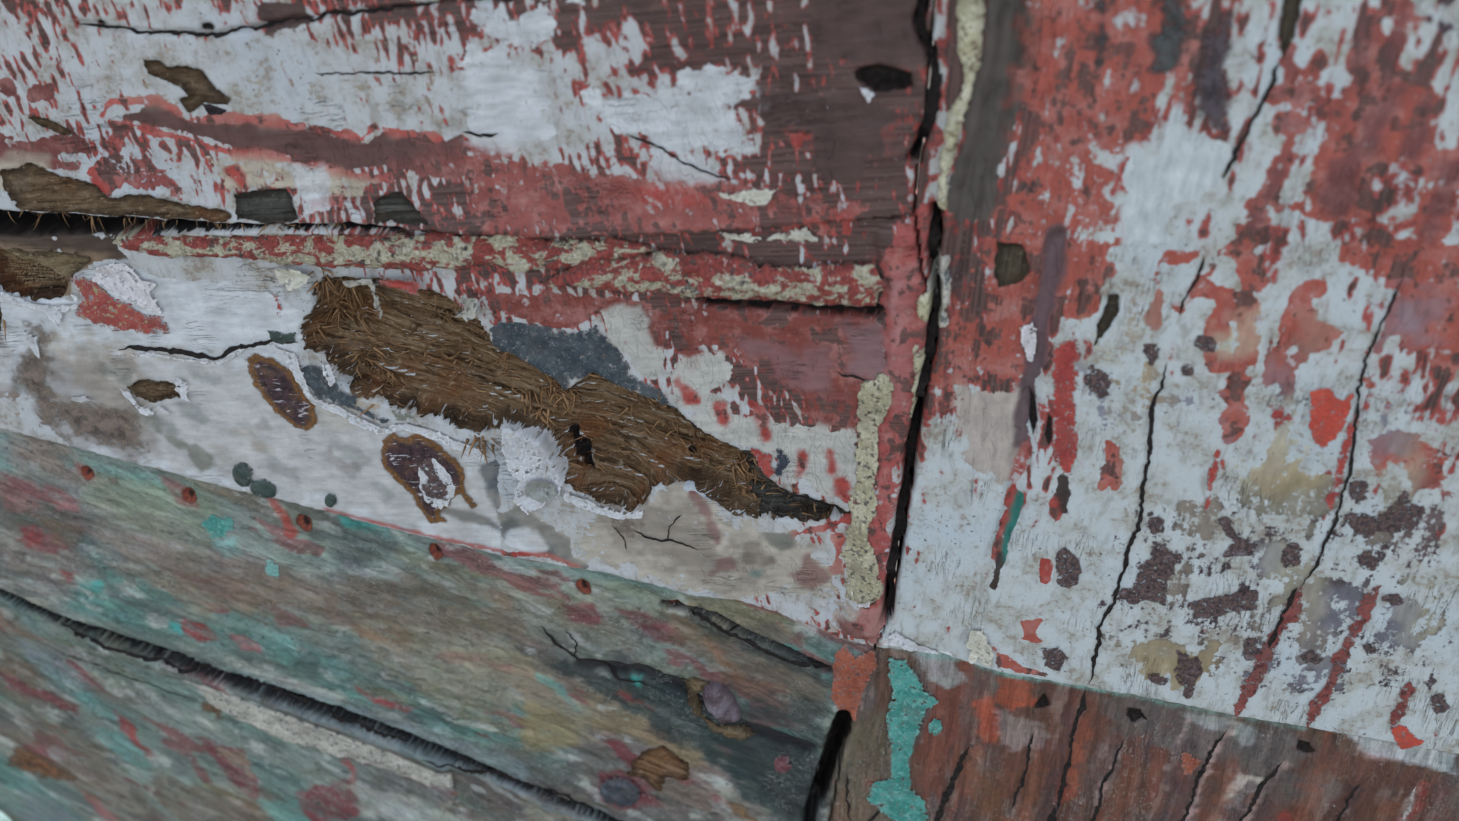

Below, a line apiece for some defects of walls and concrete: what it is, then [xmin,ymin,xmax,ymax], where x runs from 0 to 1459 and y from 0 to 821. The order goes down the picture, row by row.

crack [75,0,513,39]
crack [316,69,433,77]
spalling [268,267,851,520]
crack [750,462,829,506]
crack [612,515,697,550]
crack [1181,269,1404,821]
crack [1011,363,1167,821]
crack [541,626,649,686]
crack [691,609,830,669]
crack [61,622,621,821]
crack [934,746,969,821]